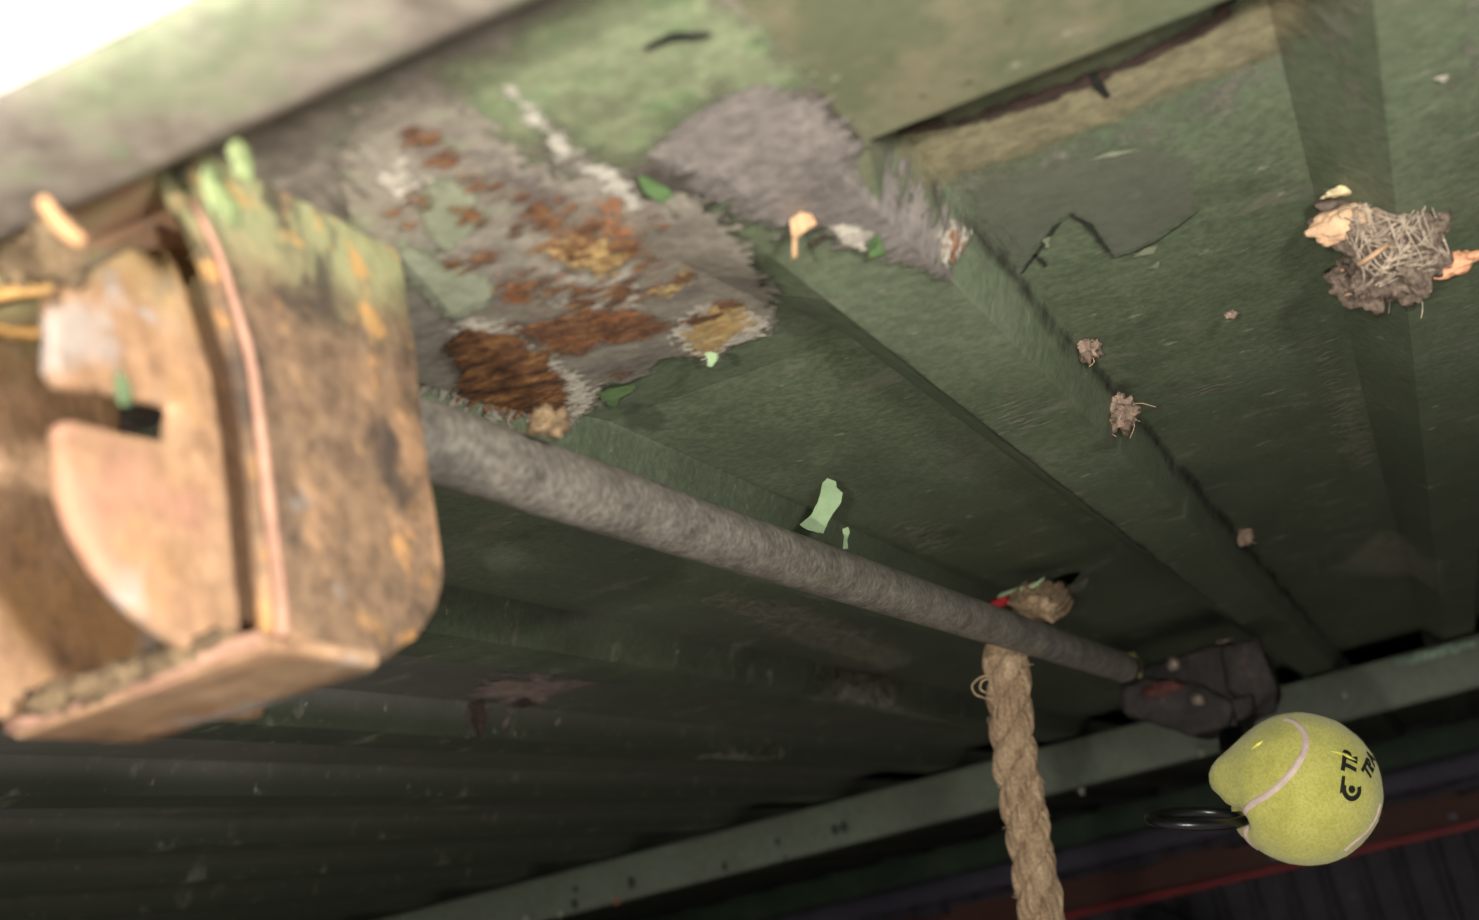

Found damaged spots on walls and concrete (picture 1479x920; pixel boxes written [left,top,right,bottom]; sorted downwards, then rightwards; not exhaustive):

rust [335,82,789,438]
peeling [440,0,972,286]
peeling [704,352,718,367]